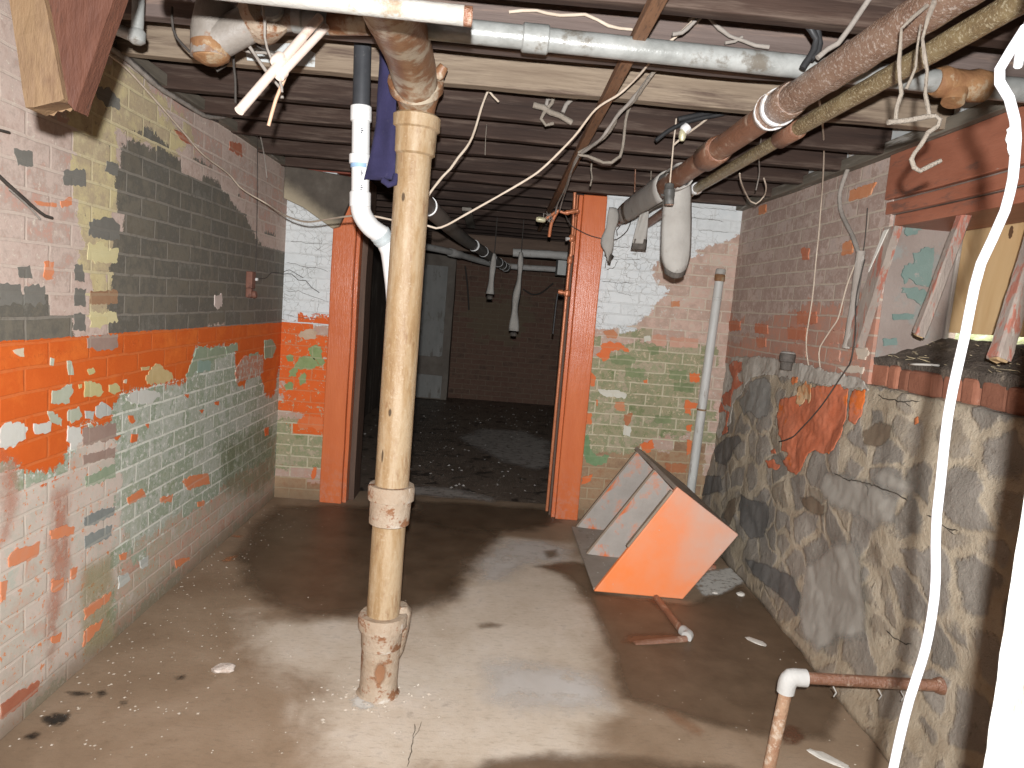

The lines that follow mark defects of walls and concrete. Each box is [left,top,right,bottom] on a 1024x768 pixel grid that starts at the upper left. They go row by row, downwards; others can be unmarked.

peeling [14,148,33,167]
peeling [35,168,86,208]
peeling [0,261,54,307]
peeling [73,217,120,351]
peeling [186,329,325,390]
peeling [0,360,173,487]
peeling [719,360,866,475]
peeling [8,506,115,567]
damp [238,506,372,616]
damp [401,502,839,737]
rust [375,664,385,684]
damp [484,755,698,768]